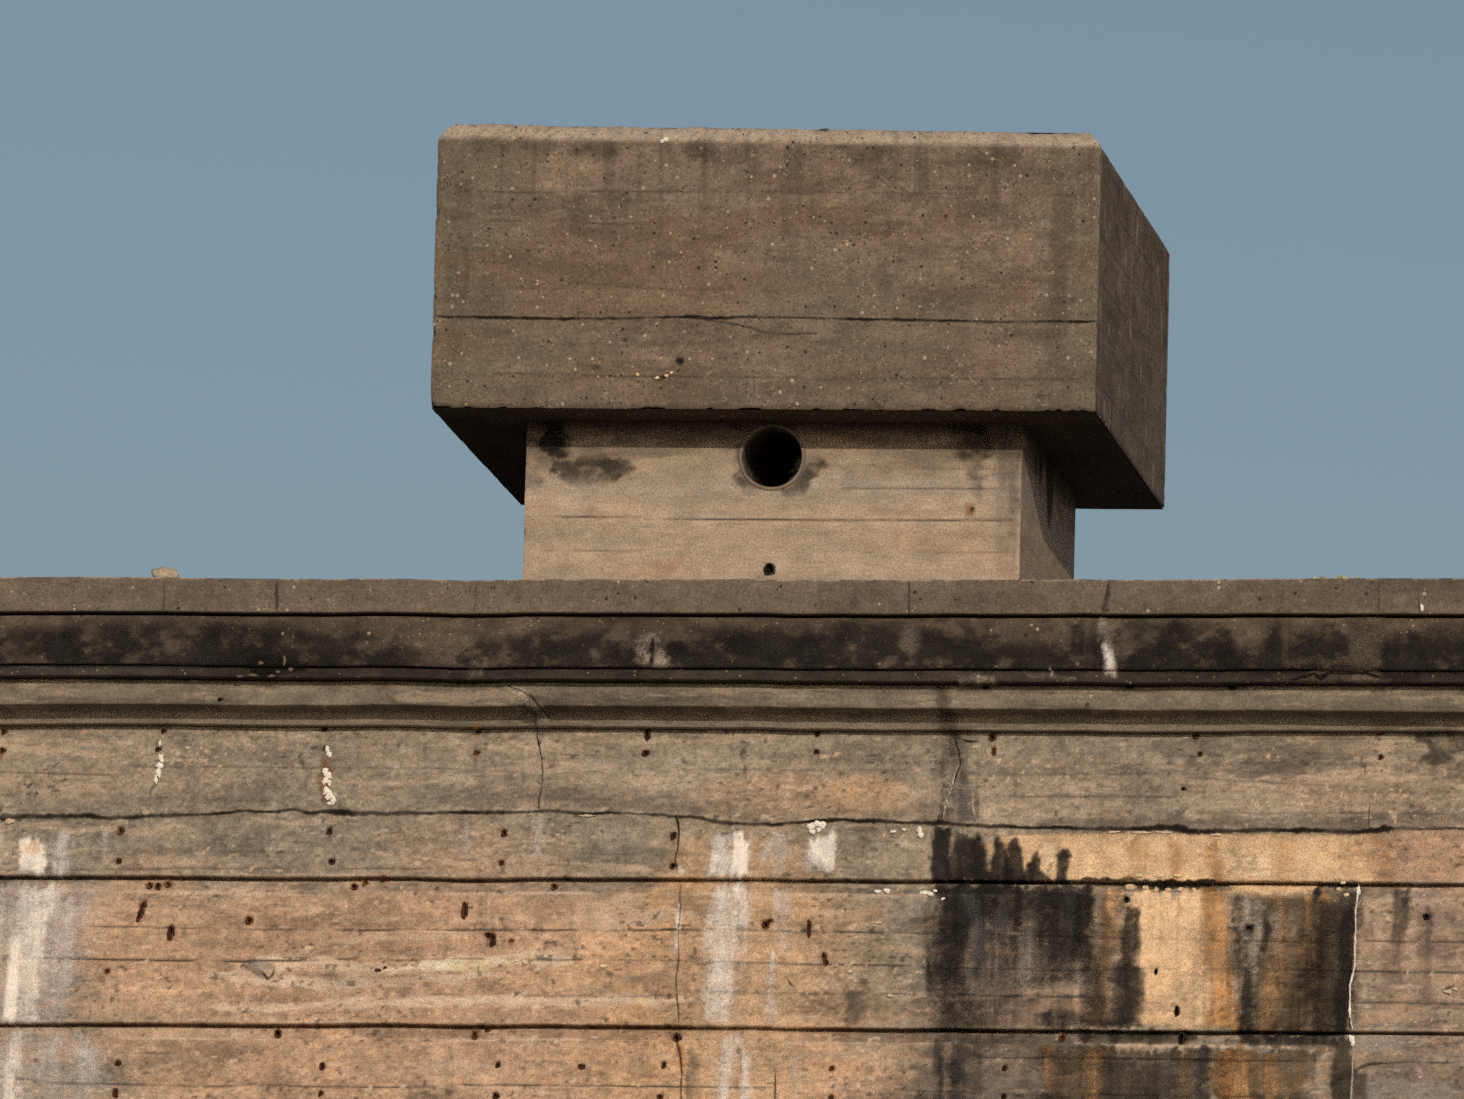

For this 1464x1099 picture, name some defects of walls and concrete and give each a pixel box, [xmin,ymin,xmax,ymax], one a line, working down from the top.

damp [530,421,634,479]
damp [0,626,418,669]
damp [456,617,1357,714]
damp [1379,632,1464,674]
efflorescence [1,832,77,1099]
crack [0,684,1464,1099]
efflorescence [704,831,785,1015]
efflorescence [806,820,836,872]
damp [909,772,1210,1099]
damp [1234,886,1366,1099]
efflorescence [720,1035,750,1099]